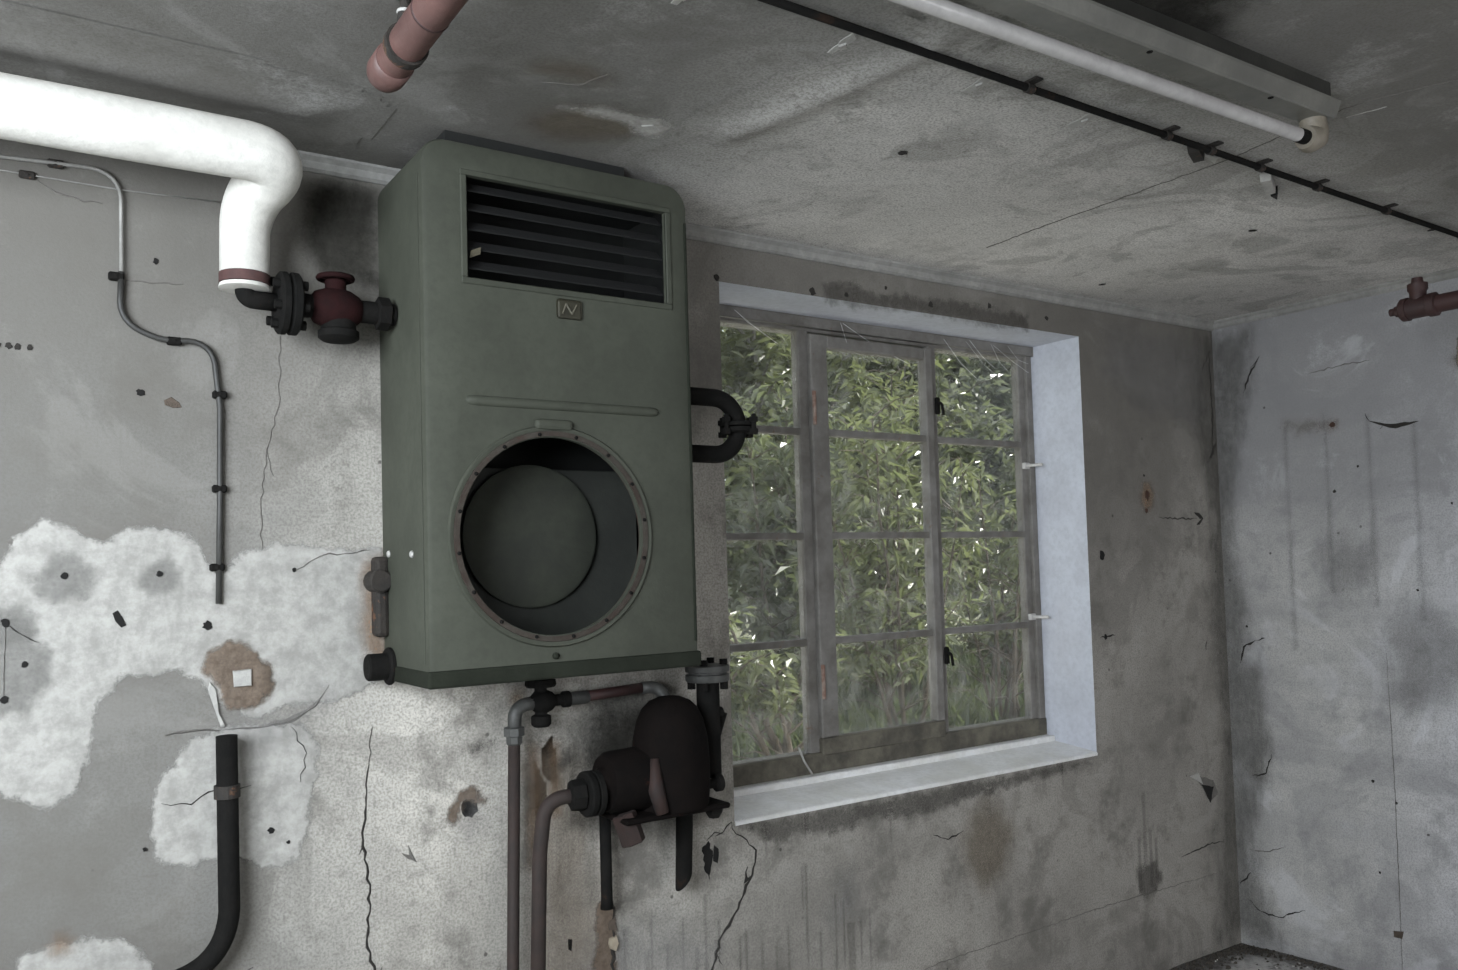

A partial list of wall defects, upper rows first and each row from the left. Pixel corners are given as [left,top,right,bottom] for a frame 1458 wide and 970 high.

peeling [0,518,385,868]
peeling [18,937,152,970]
crack [359,730,382,970]
crack [402,845,417,862]
spalling [592,902,619,970]
crack [711,822,757,970]
crack [925,841,1302,970]